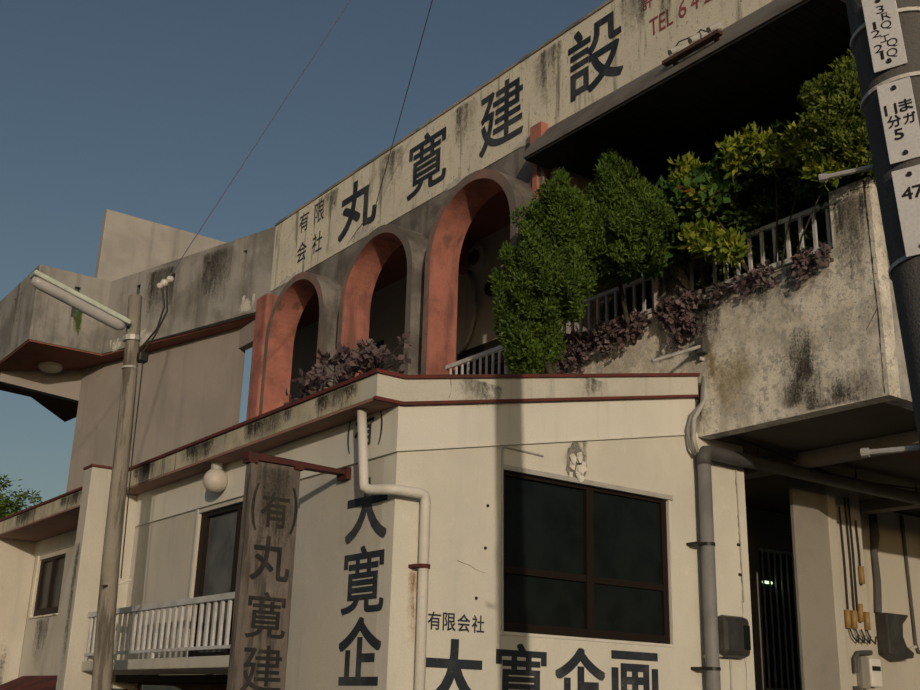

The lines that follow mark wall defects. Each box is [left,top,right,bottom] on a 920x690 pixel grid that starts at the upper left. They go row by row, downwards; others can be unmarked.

damp [149,267,174,308]
damp [782,344,860,409]